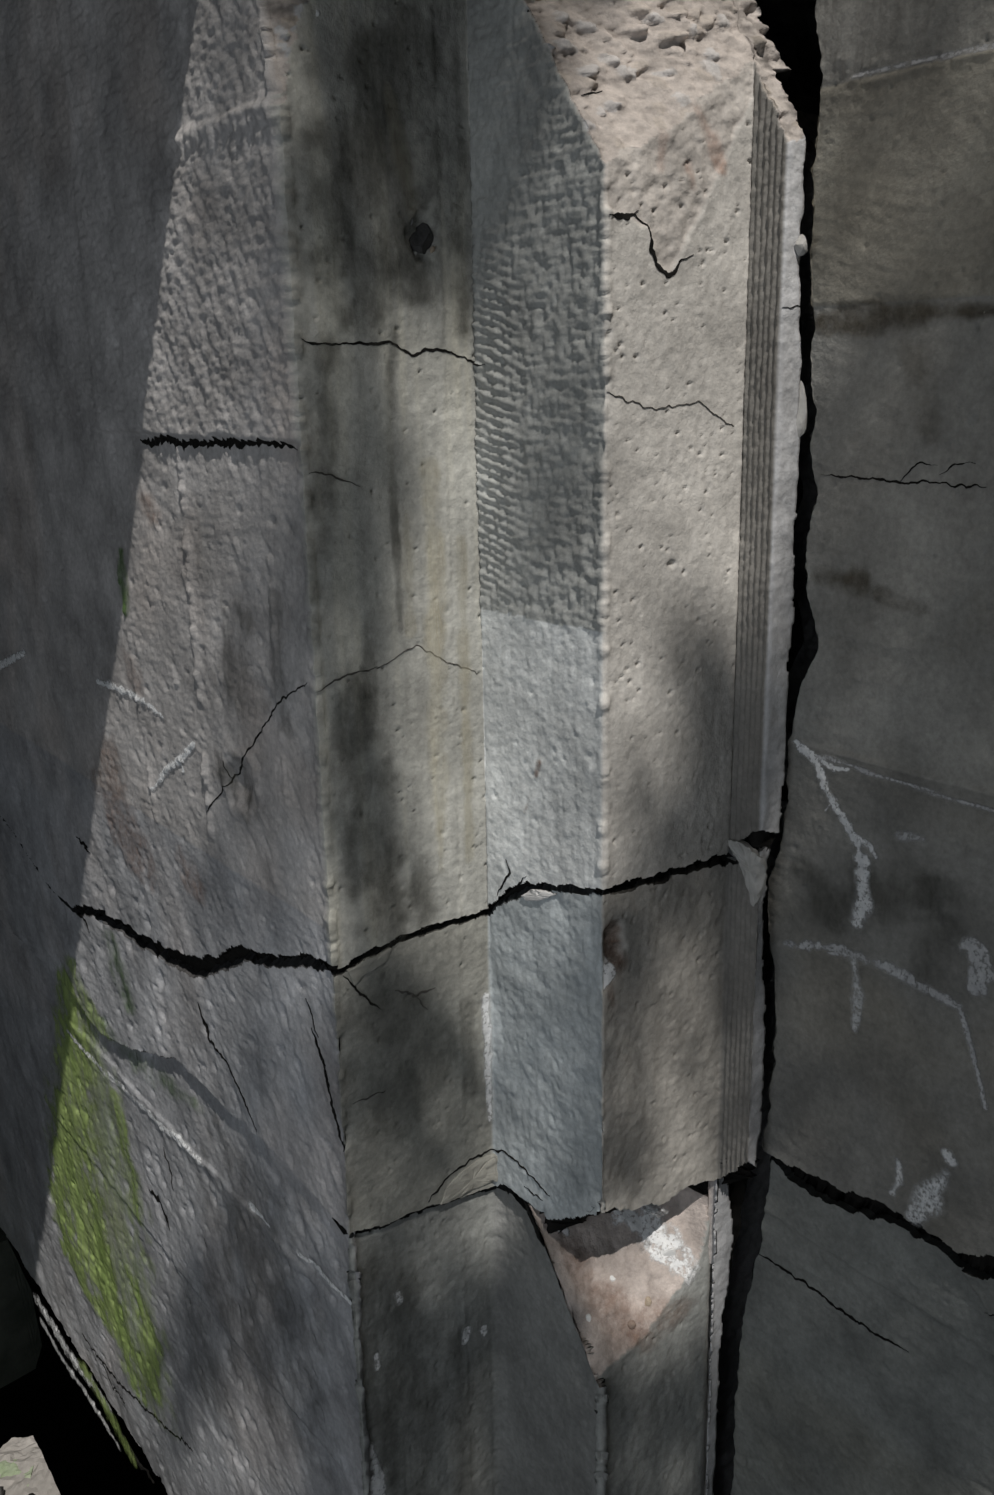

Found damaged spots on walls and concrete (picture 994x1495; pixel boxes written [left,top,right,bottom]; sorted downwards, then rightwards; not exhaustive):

crack [609,210,694,278]
crack [302,339,485,366]
crack [140,433,360,487]
crack [787,587,804,672]
crack [594,830,777,893]
crack [76,859,546,1152]
leakage [67,1030,203,1220]
crack [428,1149,617,1247]
leakage [47,1089,162,1406]
leakage [296,1250,352,1306]
crack [690,1158,994,1352]
leakage [34,1296,134,1462]